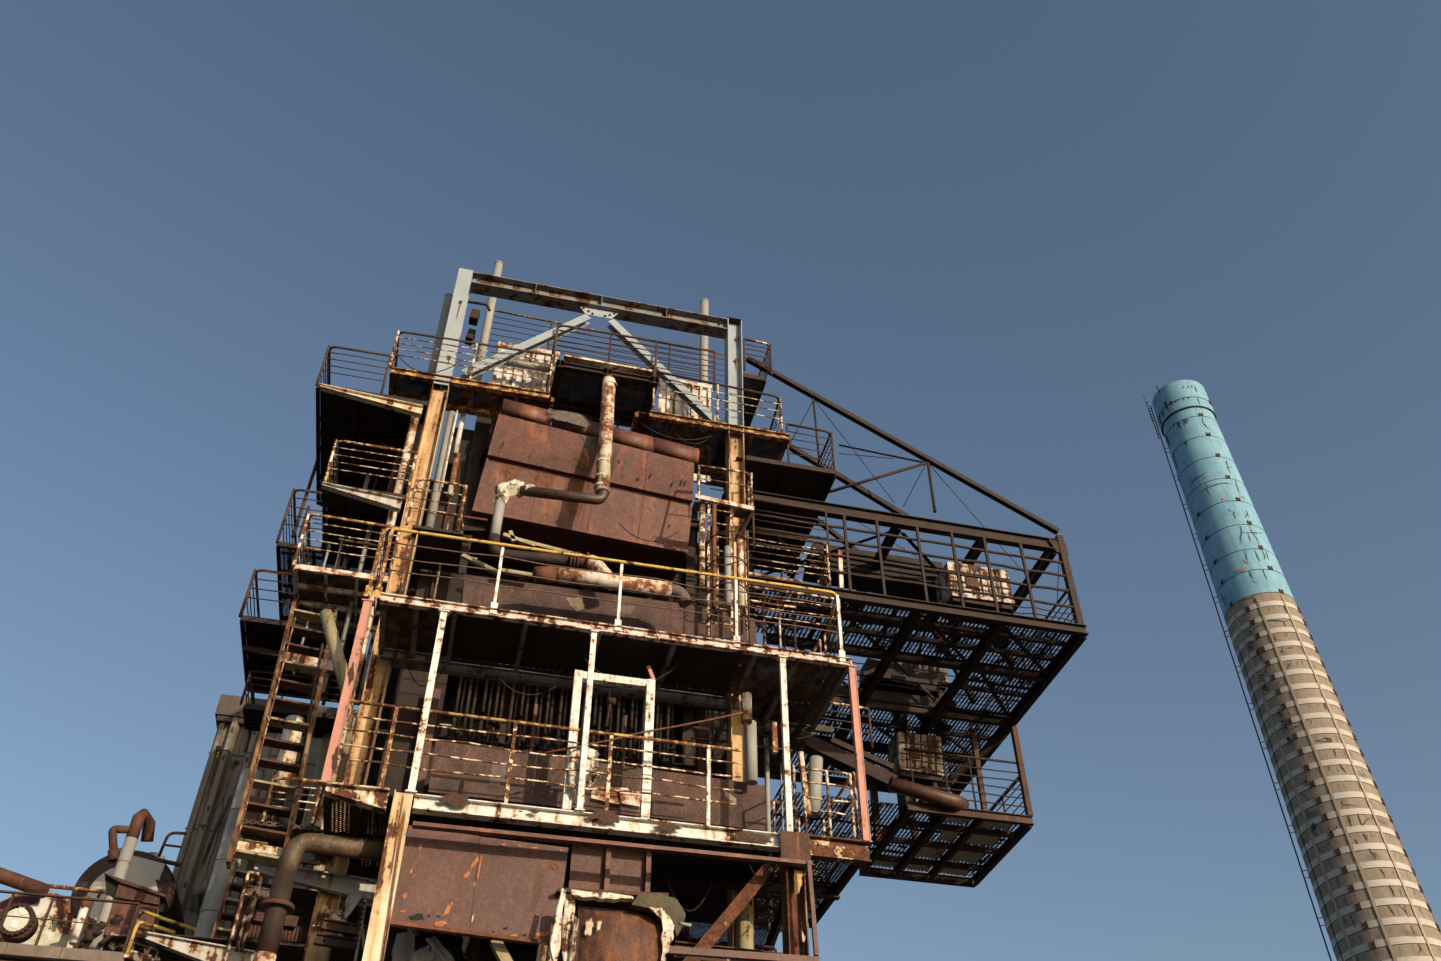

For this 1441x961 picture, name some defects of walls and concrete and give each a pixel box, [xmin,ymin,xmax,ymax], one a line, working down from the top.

corrosion [502,465,520,482]
corrosion [536,447,592,515]
corrosion [438,794,470,808]
corrosion [734,831,772,843]
corrosion [380,796,405,961]
peeling [585,918,602,935]